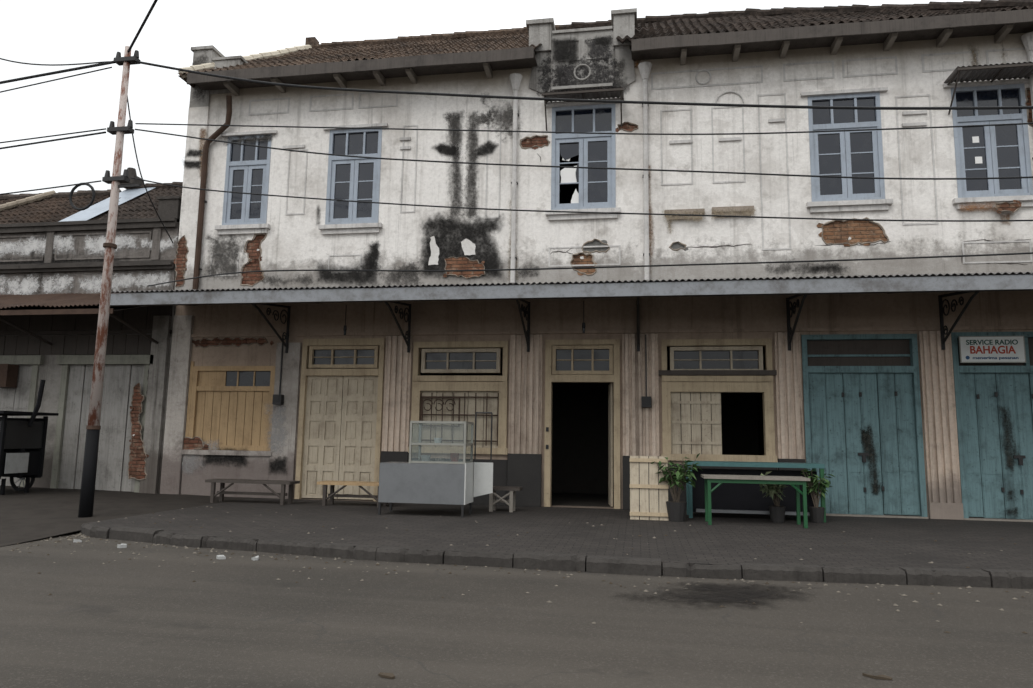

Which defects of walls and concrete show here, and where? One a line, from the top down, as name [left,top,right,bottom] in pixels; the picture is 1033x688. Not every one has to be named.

mould [536,36,630,98]
spalling [519,135,550,150]
spalling [615,122,638,132]
leakage [265,94,538,286]
spalling [994,200,1022,223]
spalling [816,217,889,247]
peeling [0,235,189,295]
spalling [240,233,268,287]
spalling [443,256,485,279]
spalling [570,239,610,276]
spalling [128,382,149,480]